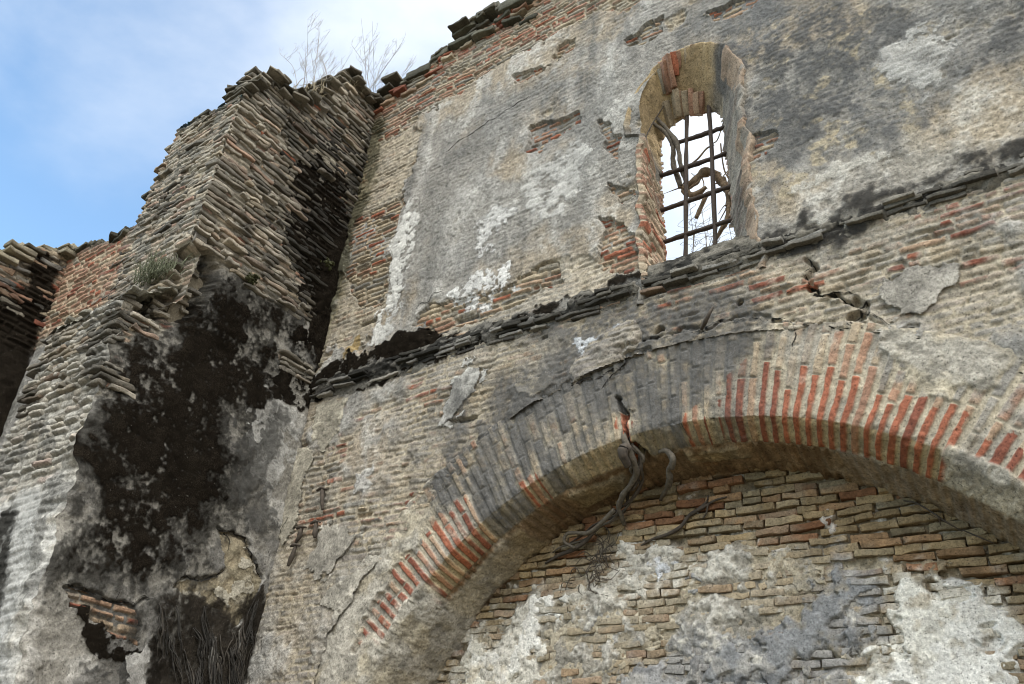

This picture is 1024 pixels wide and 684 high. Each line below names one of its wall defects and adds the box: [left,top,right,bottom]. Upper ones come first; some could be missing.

flaking render [626,18,664,47]
damp [874,15,963,102]
flaking render [526,113,581,155]
damp [758,137,1024,256]
flaking render [595,220,639,275]
damp [309,200,482,402]
crack [696,258,919,346]
flaking render [879,261,961,323]
flaking render [438,355,490,430]
crack [571,360,648,452]
damp [226,384,302,542]
flaking render [65,586,140,646]